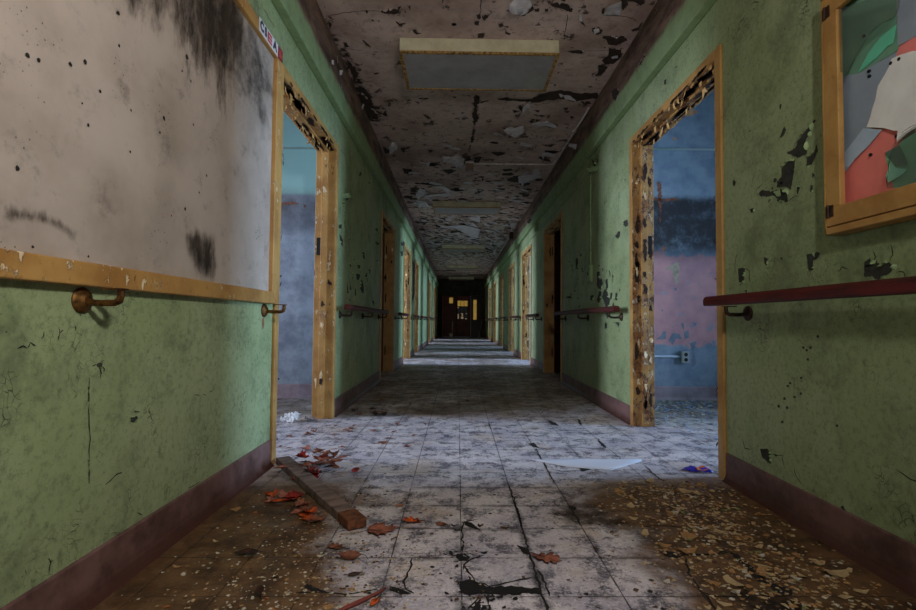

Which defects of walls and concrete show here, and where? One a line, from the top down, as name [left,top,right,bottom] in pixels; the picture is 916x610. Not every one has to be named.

water stain [176,0,269,118]
peeling [507,0,646,77]
peeling [284,82,334,157]
peeling [632,65,714,148]
peeling [382,90,598,266]
peeling [636,163,652,200]
peeling [752,119,818,204]
water stain [189,233,215,274]
peeling [616,213,663,311]
peeling [635,322,697,367]
peeling [635,378,652,409]
crack [508,485,550,610]